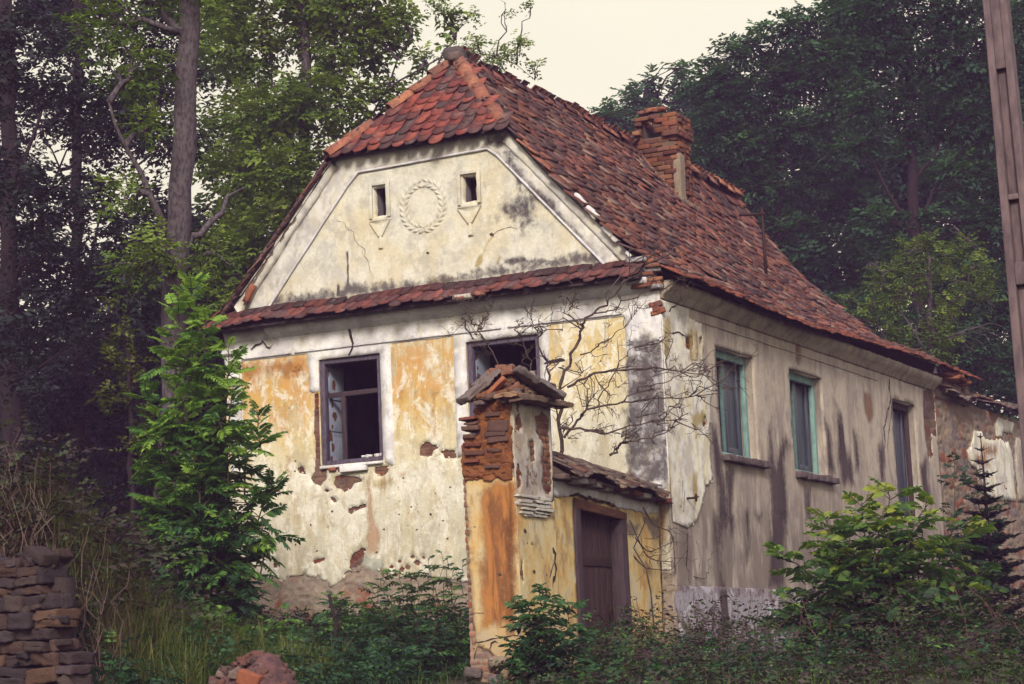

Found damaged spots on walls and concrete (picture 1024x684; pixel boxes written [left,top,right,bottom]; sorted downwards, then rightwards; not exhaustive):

damp [487,134,582,237]
flaking render [375,466,389,476]
rust [481,481,519,624]
flaking render [420,256,713,528]
damp [624,336,668,482]
damp [712,427,733,544]
damp [720,574,730,633]
damp [768,431,788,587]
damp [827,414,859,486]
damp [921,459,930,501]